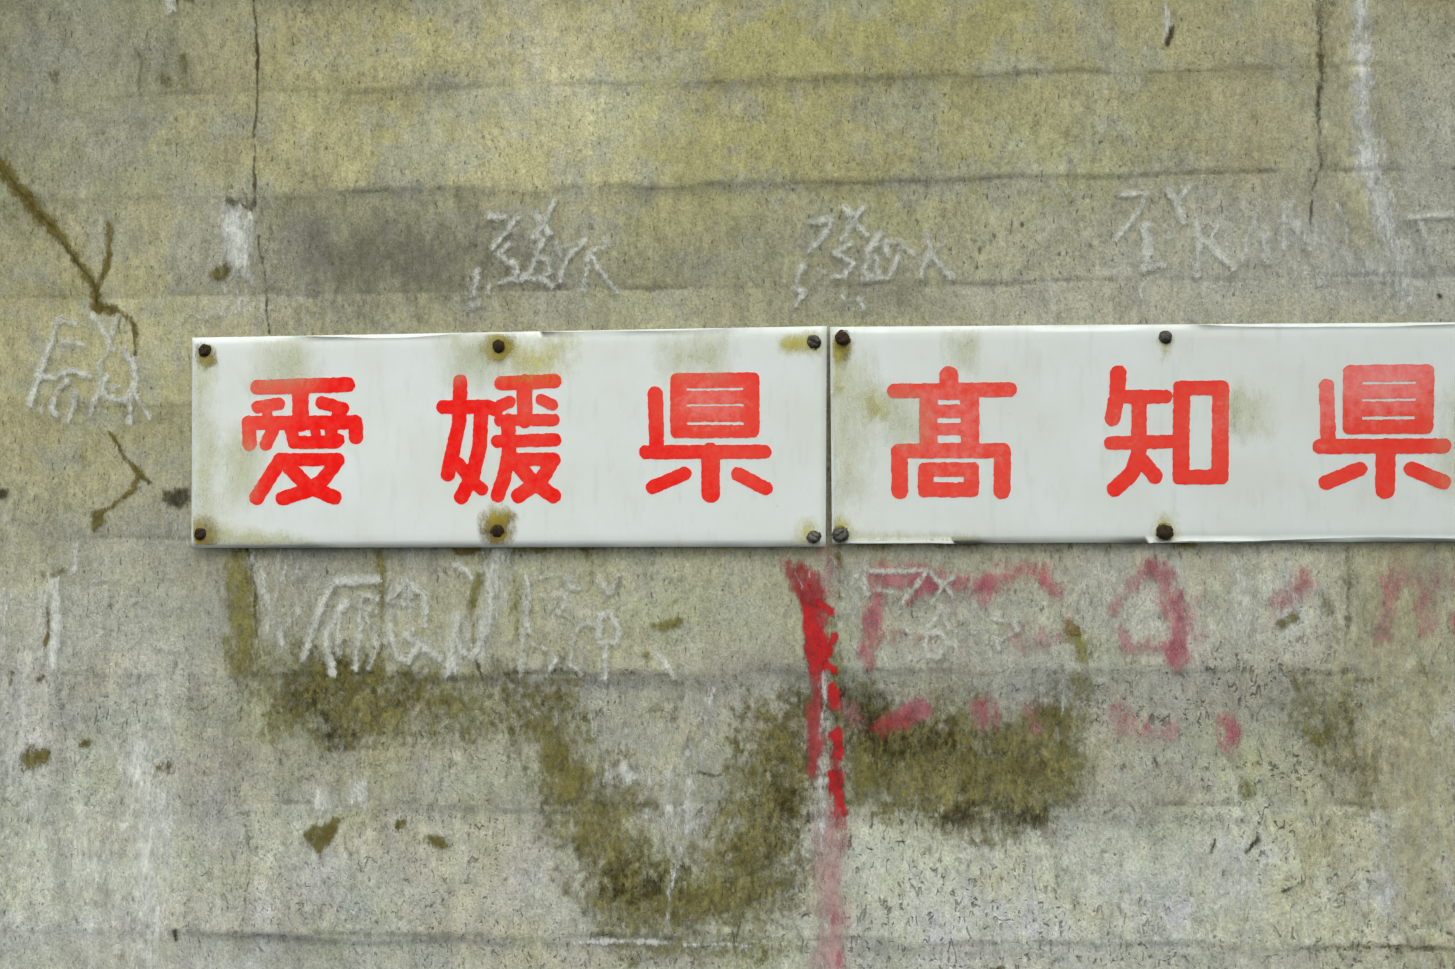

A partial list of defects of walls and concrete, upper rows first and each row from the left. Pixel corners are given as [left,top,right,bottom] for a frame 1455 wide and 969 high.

crack [0,157,138,356]
crack [233,0,270,334]
crack [1308,0,1336,232]
leakage [1279,0,1417,314]
crack [91,431,152,532]
crack [245,548,257,633]
leakage [443,547,599,677]
leakage [1172,542,1198,589]
leakage [303,776,368,853]
leakage [428,835,448,848]
leakage [573,687,750,948]
leakage [785,544,891,969]